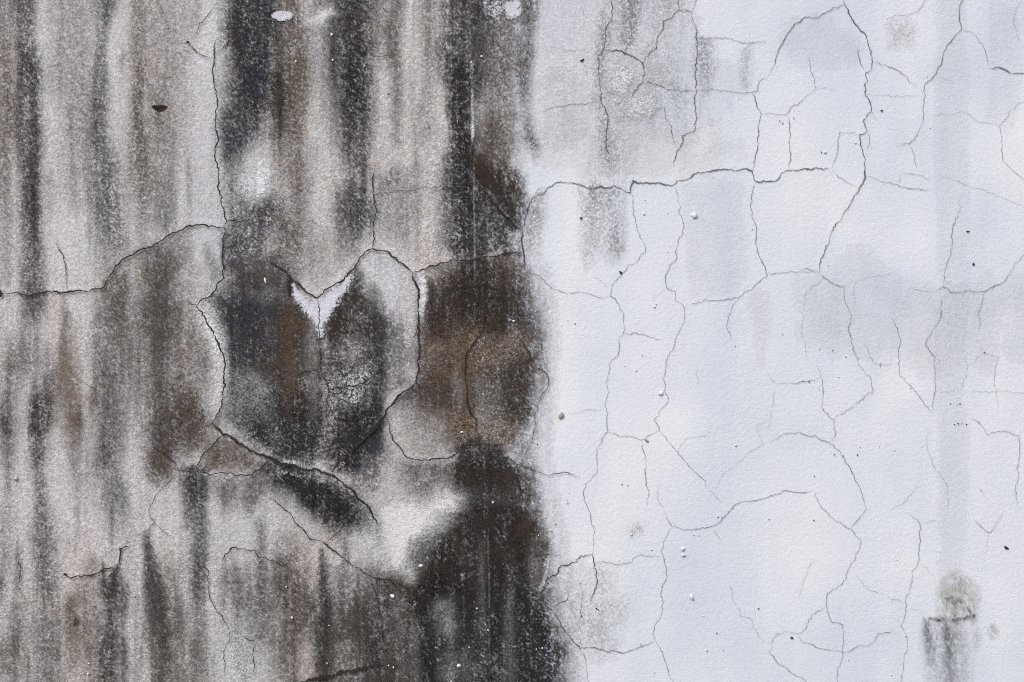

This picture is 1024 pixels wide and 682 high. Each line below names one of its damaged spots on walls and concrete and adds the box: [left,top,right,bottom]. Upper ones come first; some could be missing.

water stain [0,0,45,321]
water stain [91,0,116,236]
crack [771,0,963,286]
water stain [99,0,567,682]
crack [2,1,841,653]
water stain [28,389,55,601]
crack [301,664,383,682]